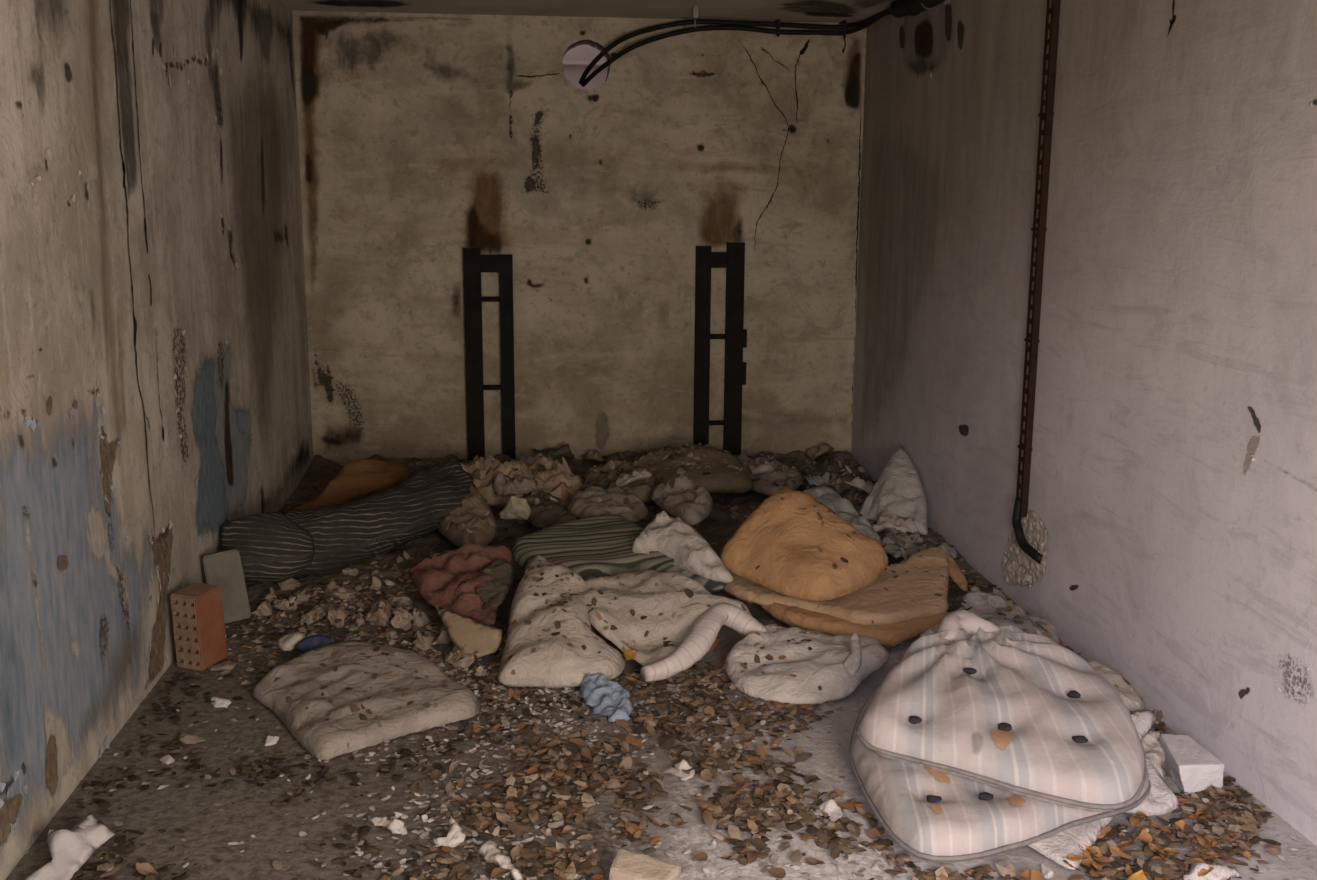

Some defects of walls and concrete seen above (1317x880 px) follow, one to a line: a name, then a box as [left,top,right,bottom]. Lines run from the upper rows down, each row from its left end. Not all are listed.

leakage [112,0,136,193]
leakage [149,0,163,57]
leakage [205,0,289,74]
rust [469,174,503,252]
rust [703,195,741,244]
crack [738,38,810,251]
peeling [173,328,253,543]
peeling [0,380,173,854]